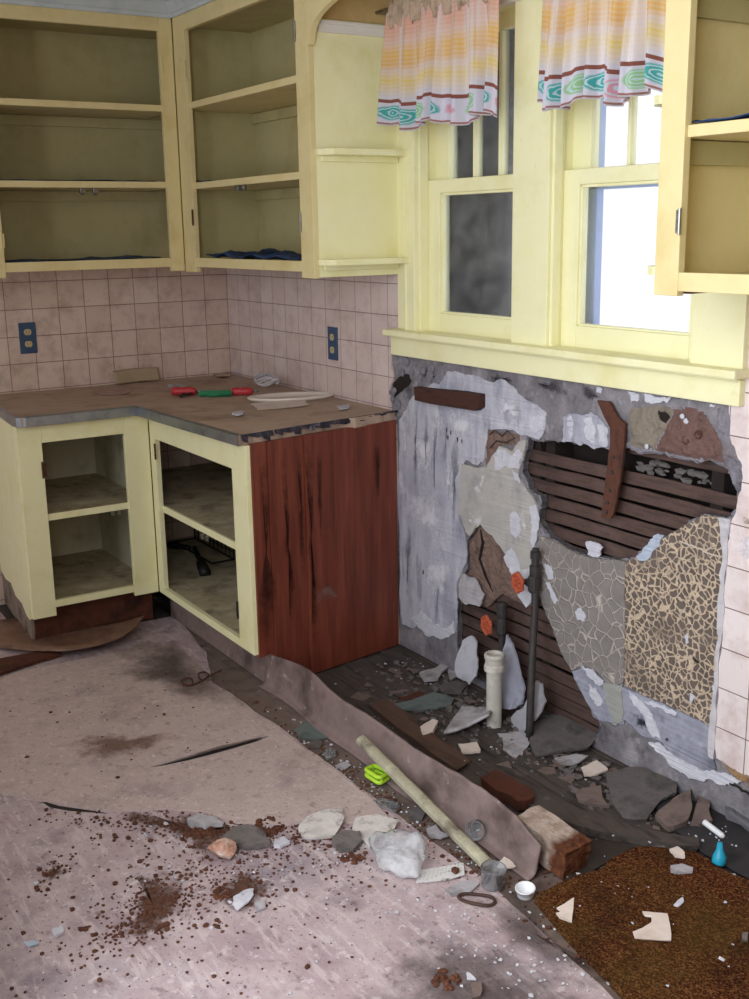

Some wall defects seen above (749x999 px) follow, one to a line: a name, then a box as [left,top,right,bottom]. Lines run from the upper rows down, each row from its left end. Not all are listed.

peeling [390,357,743,785]